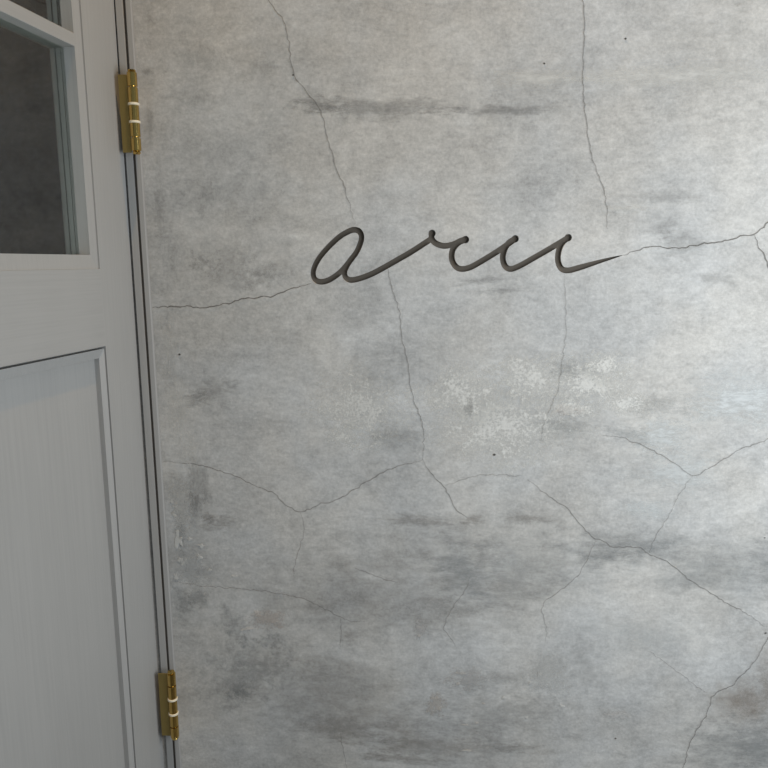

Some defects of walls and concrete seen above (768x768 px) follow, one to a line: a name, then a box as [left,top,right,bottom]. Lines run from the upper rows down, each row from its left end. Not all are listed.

crack [627,222,768,266]
crack [153,283,311,308]